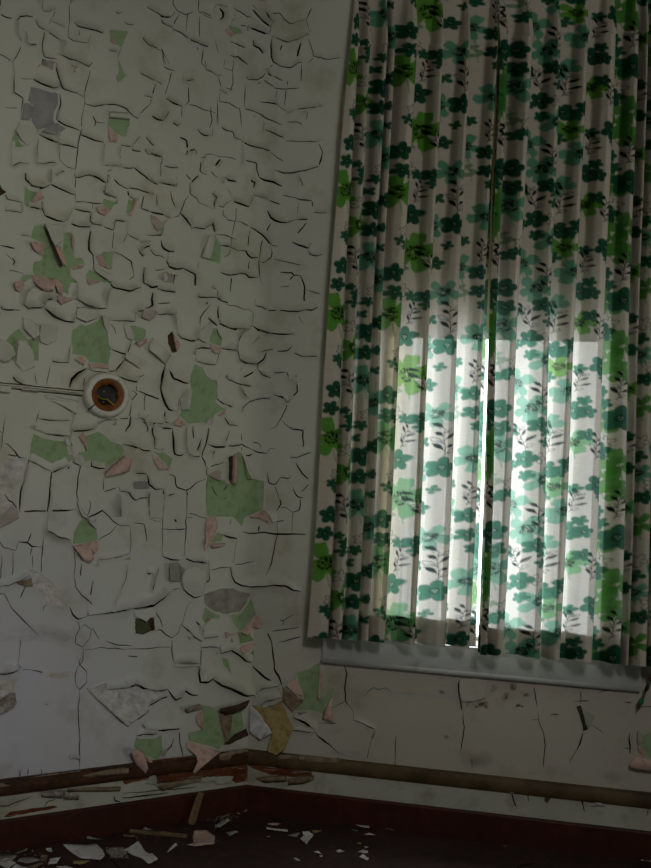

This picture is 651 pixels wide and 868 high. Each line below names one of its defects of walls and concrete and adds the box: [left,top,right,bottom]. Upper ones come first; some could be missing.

peeling [9,84,65,150]
peeling [14,223,113,370]
peeling [0,317,58,372]
peeling [168,331,180,352]
peeling [173,360,227,426]
peeling [0,429,132,530]
peeling [201,449,278,552]
peeling [169,562,262,654]
peeling [25,661,342,800]
crack [453,677,482,749]
crack [534,689,558,766]
crack [114,786,196,802]